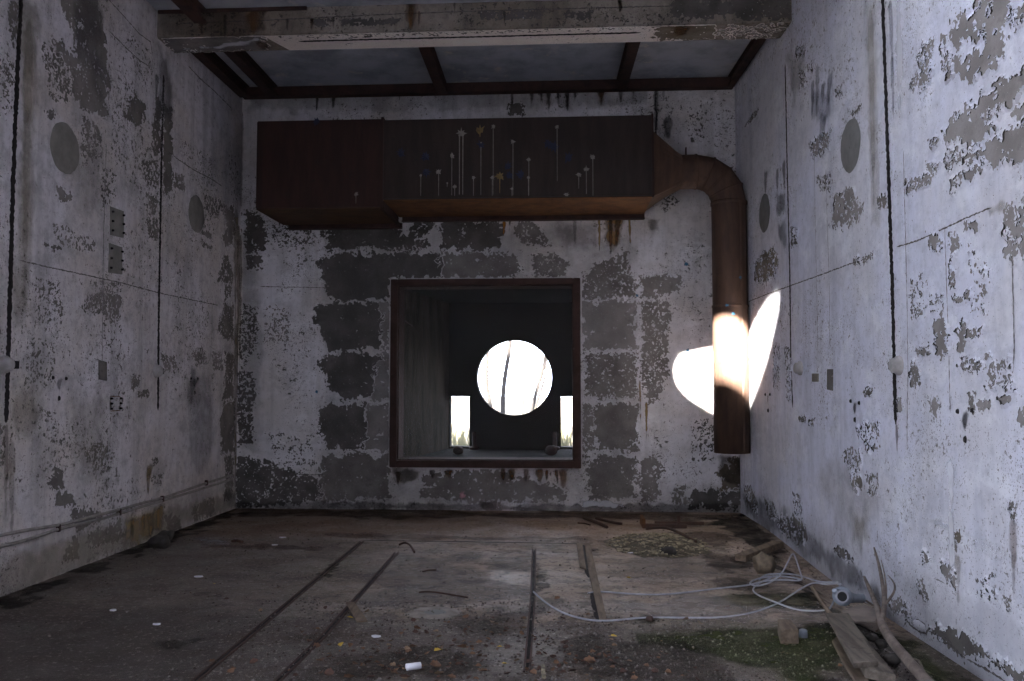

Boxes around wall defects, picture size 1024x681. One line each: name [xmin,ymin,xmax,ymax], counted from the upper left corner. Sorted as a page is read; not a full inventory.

peeling [904,0,1024,197]
rust [598,220,631,252]
peeling [809,127,888,233]
peeling [1001,194,1024,269]
peeling [173,192,808,549]
peeling [908,216,1024,430]
rust [501,469,567,487]
peeling [842,418,881,498]